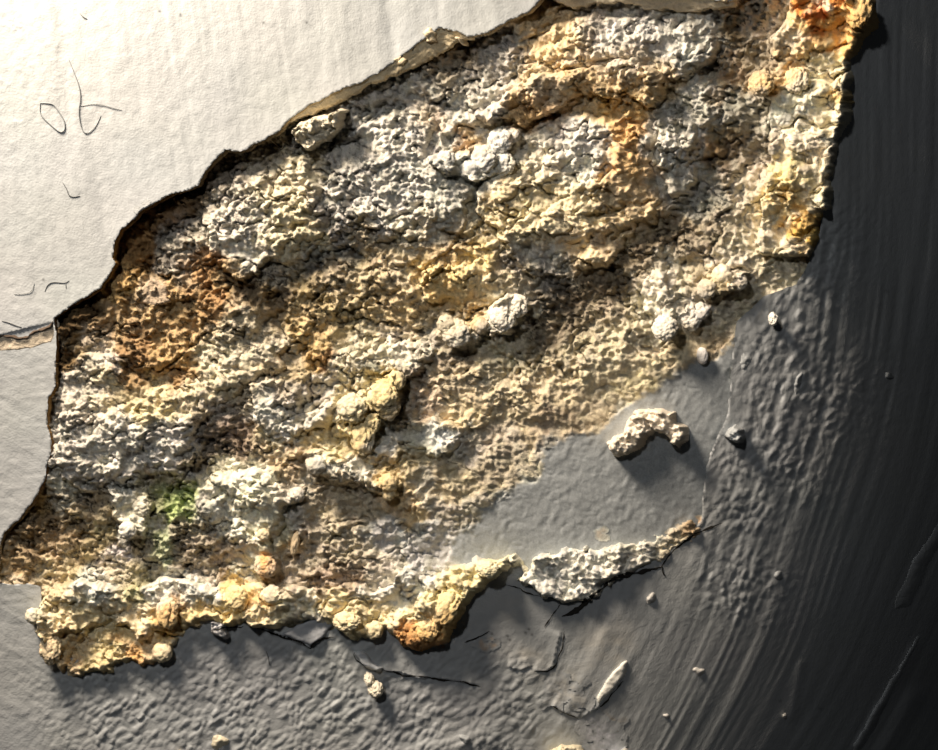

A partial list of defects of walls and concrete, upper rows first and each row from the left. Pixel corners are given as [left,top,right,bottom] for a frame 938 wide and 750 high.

corrosion [789,0,830,40]
leakage [748,0,880,258]
crack [0,319,59,351]
leakage [53,10,755,540]
flaking render [0,0,810,600]
leakage [25,461,704,677]
peeling [211,620,230,641]
peeling [283,620,335,647]
crack [353,654,478,686]
peeling [539,660,628,750]